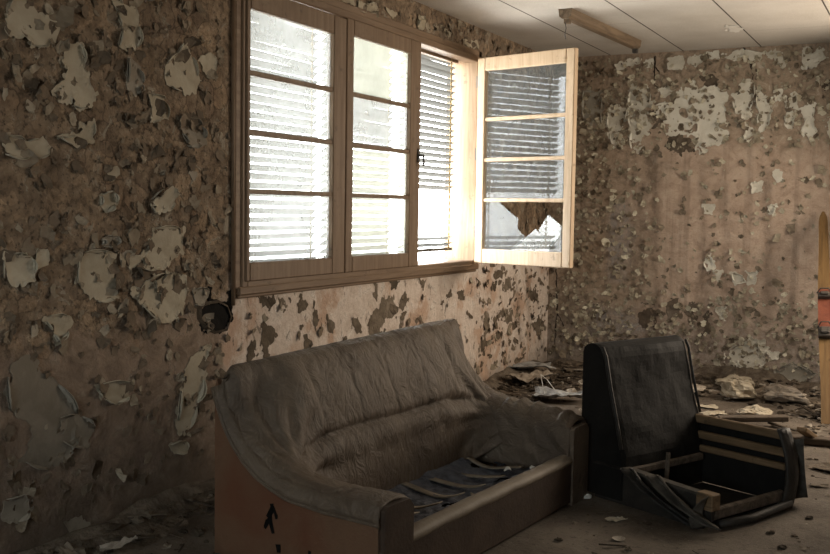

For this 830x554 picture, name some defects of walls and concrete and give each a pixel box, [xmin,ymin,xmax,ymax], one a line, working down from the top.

peeling [413,9,531,58]
peeling [467,46,830,382]
peeling [0,0,234,533]
flaking render [239,293,335,362]
flaking render [343,281,424,340]
flaking render [440,289,465,308]